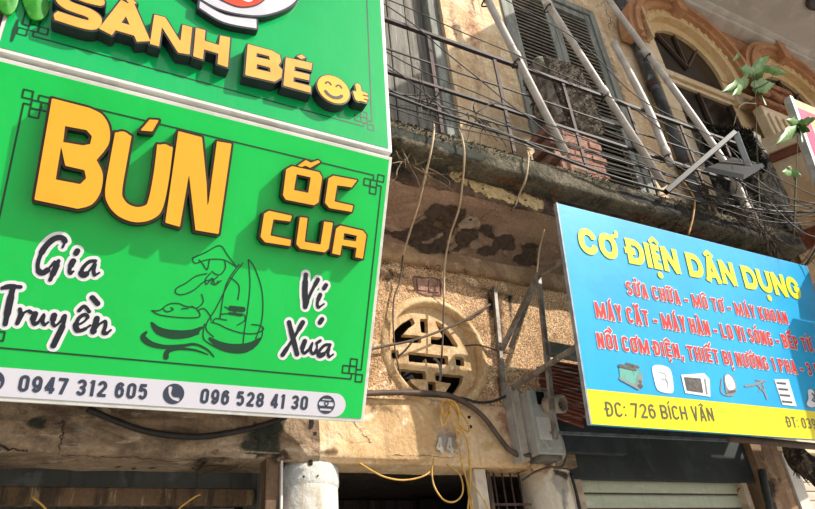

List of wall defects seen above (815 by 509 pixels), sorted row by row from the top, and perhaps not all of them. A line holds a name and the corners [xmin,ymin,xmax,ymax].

water stain [389,125,486,174]
peeling [446,171,545,213]
flaking render [384,204,538,267]
flaking render [412,276,443,297]
crack [55,421,171,460]
water stain [241,420,285,457]